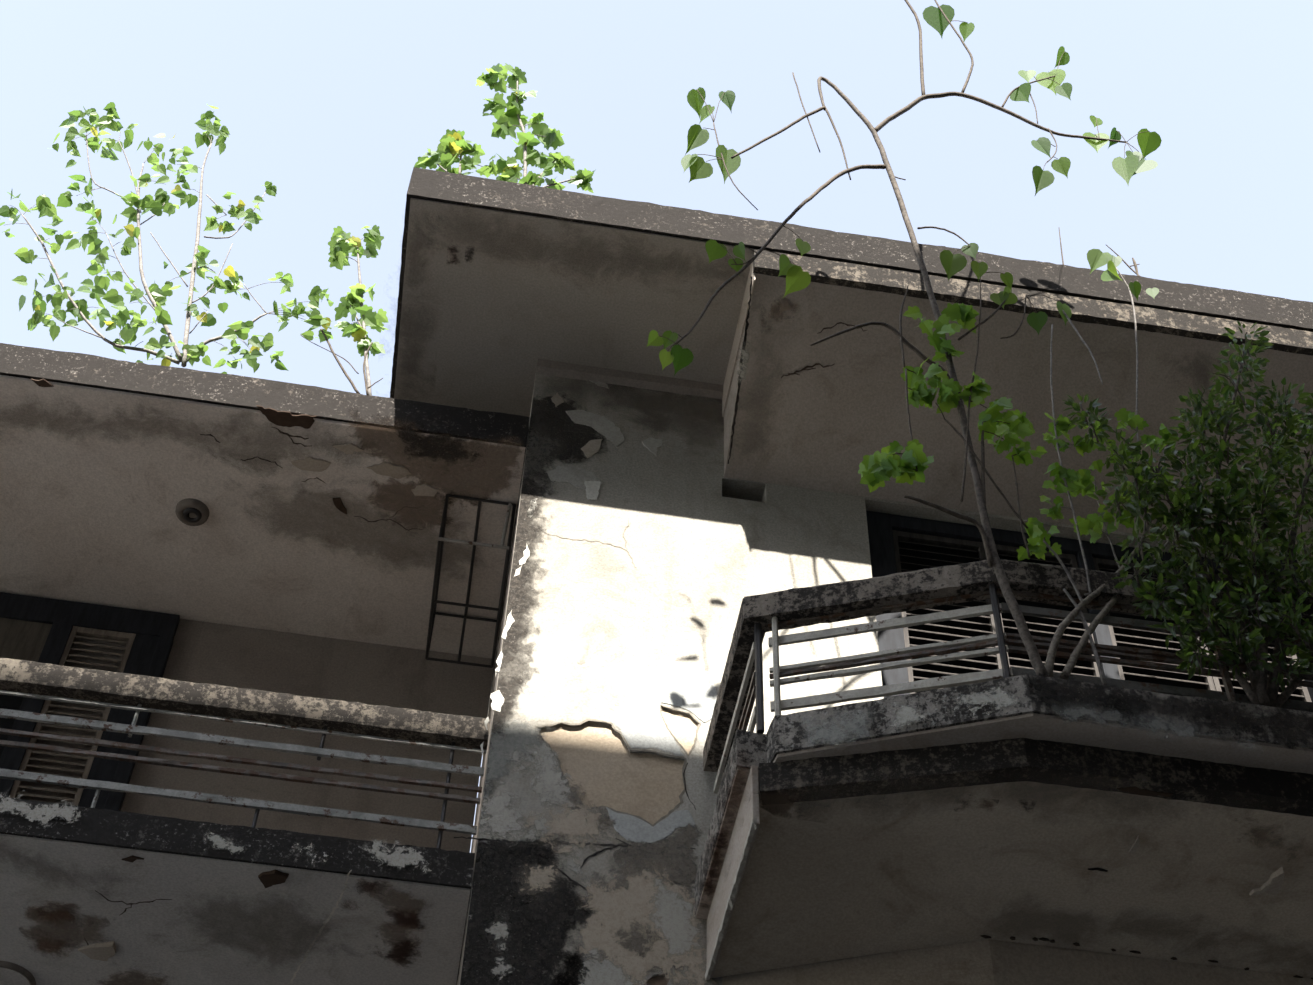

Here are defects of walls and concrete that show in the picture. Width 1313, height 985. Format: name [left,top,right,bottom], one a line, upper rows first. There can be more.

crack [781,322,867,379]
peeling [546,393,625,501]
peeling [514,546,530,576]
peeling [480,610,515,756]
water stain [350,395,702,985]
peeling [535,670,717,844]
water stain [803,711,867,744]
water stain [892,704,927,728]
water stain [950,673,1313,749]
water stain [25,903,106,956]
peeling [579,867,718,985]